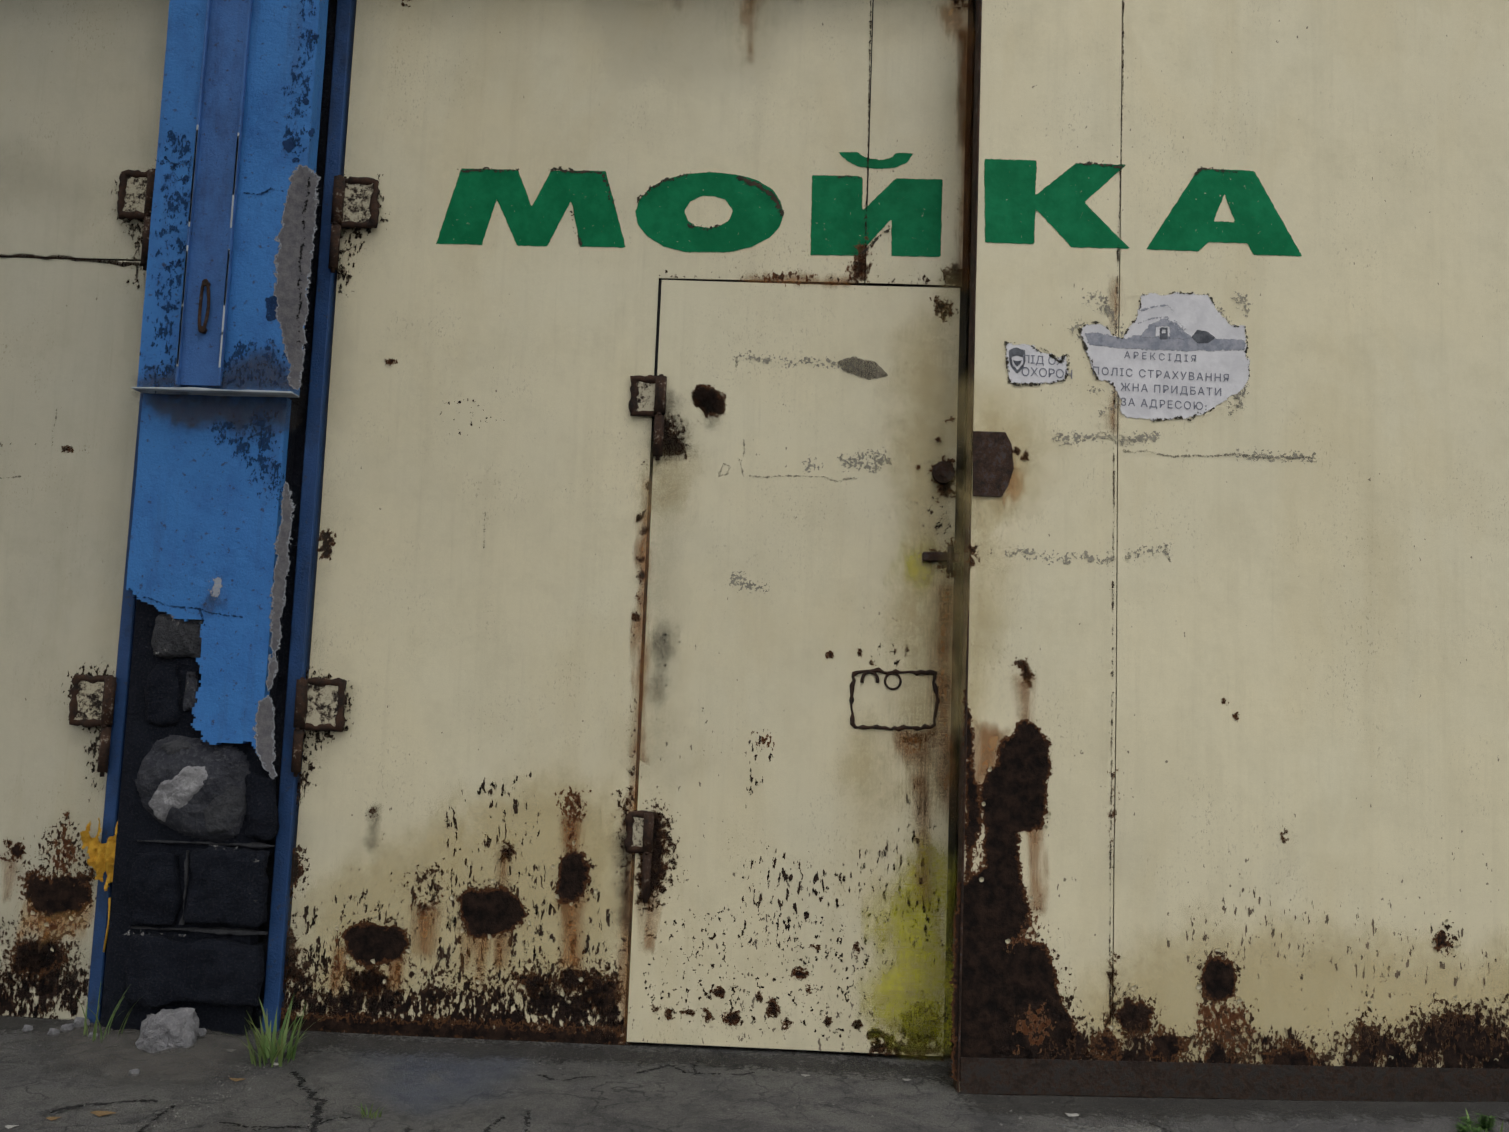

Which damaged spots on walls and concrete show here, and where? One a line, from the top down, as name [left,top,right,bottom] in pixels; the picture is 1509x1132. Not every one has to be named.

peeling [265,128,321,390]
spalling [124,481,296,1009]
corrosion [280,416,1509,1099]
corrosion [0,812,97,1020]
leakage [872,842,954,1046]
crack [46,1098,177,1132]
crack [217,1072,358,1132]
crack [482,1071,595,1132]
crack [634,1056,755,1076]